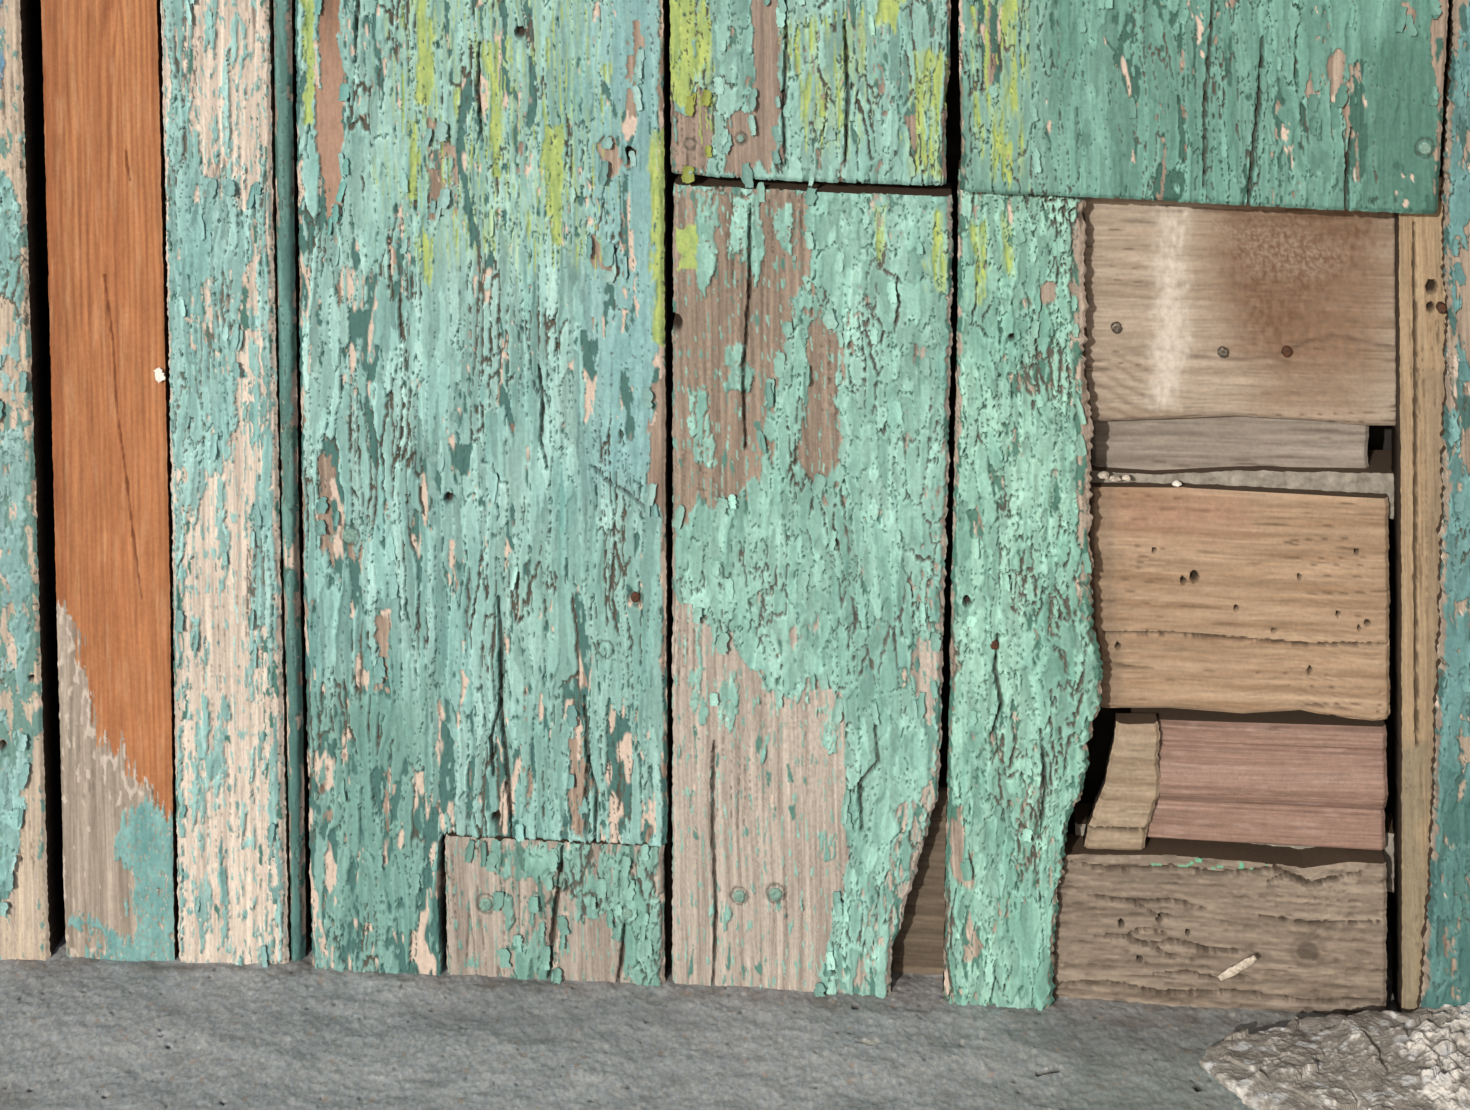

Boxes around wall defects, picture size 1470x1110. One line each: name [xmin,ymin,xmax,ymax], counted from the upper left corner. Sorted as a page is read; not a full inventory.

peeling [0,0,27,204]
peeling [184,0,268,252]
peeling [313,0,350,235]
peeling [643,0,846,529]
crack [741,203,753,451]
peeling [1013,199,1094,582]
peeling [0,323,278,967]
peeling [446,839,652,984]
peeling [672,588,853,997]
crack [989,633,1004,741]
crack [1039,728,1049,834]
crack [1061,825,1382,1004]